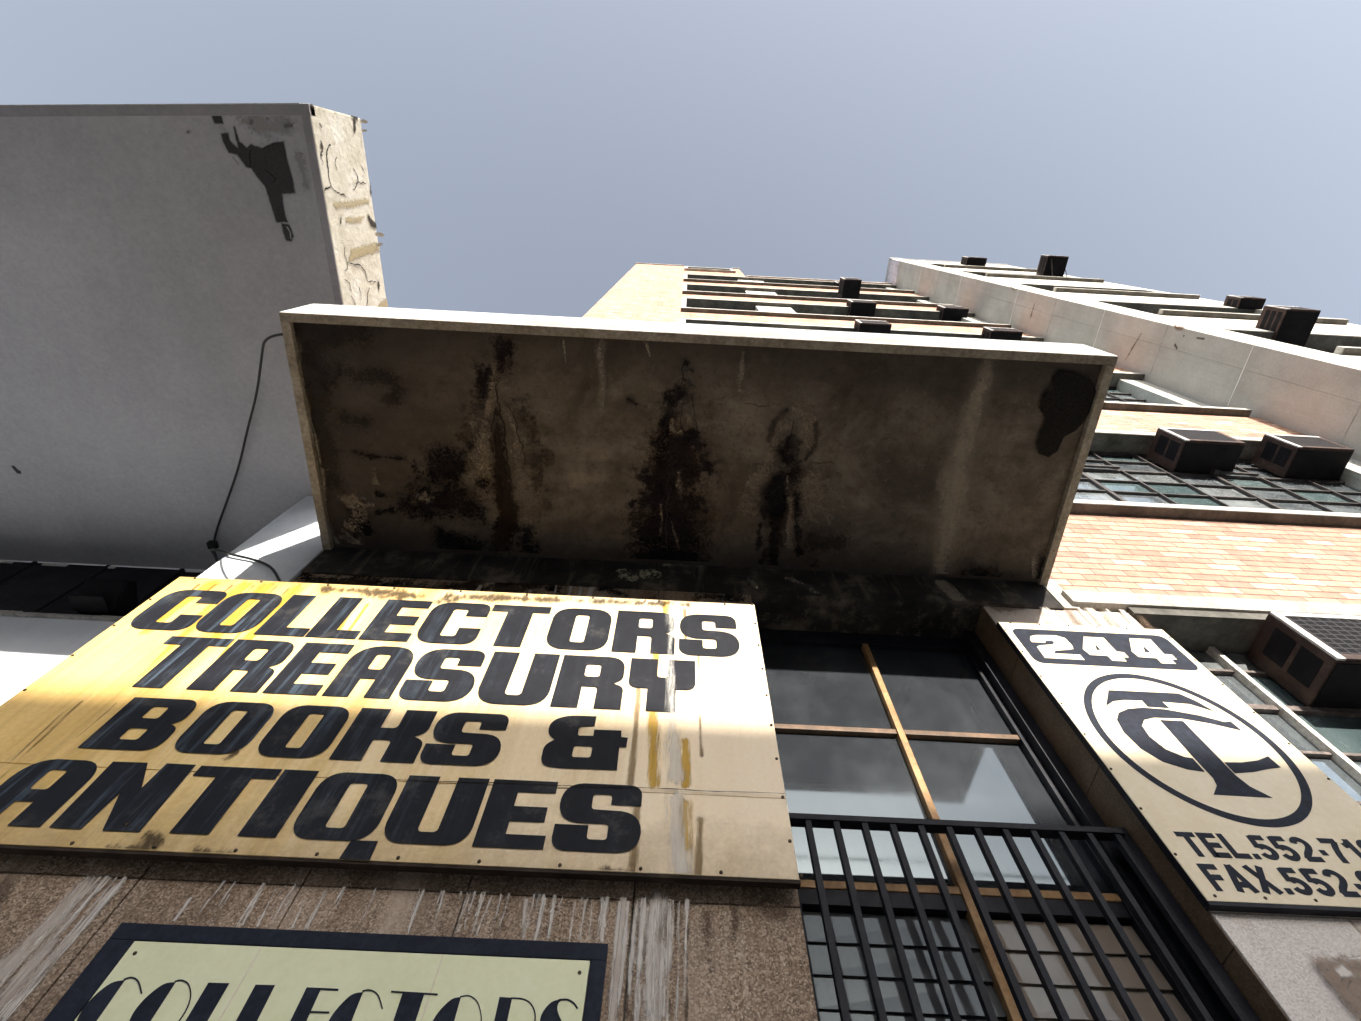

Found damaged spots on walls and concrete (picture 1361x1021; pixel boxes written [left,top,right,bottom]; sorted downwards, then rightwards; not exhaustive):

peeling [212,116,309,241]
crack [320,144,366,195]
crack [344,248,376,303]
water stain [293,322,493,551]
spalling [1036,370,1096,457]
water stain [624,360,850,594]
water stain [298,573,627,598]
water stain [693,580,759,602]
efflorescence [173,881,236,921]
efflorescence [236,883,346,930]
efflorescence [408,890,690,1021]